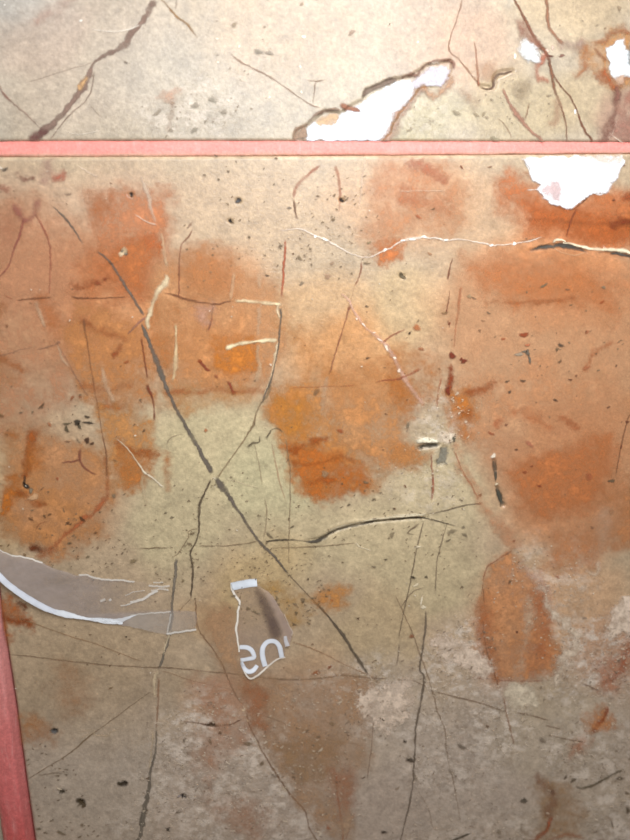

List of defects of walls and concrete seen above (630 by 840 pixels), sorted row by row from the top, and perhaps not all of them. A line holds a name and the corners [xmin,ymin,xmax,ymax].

crack [0,1,193,140]
spalling [293,58,455,141]
crack [448,28,543,142]
spalling [514,40,540,63]
crack [514,0,593,141]
spalling [606,40,630,83]
corrosion [499,171,630,248]
spalling [524,155,625,210]
corrosion [81,193,284,414]
corrosion [0,405,153,560]
crack [19,191,630,840]
corrosion [265,365,426,498]